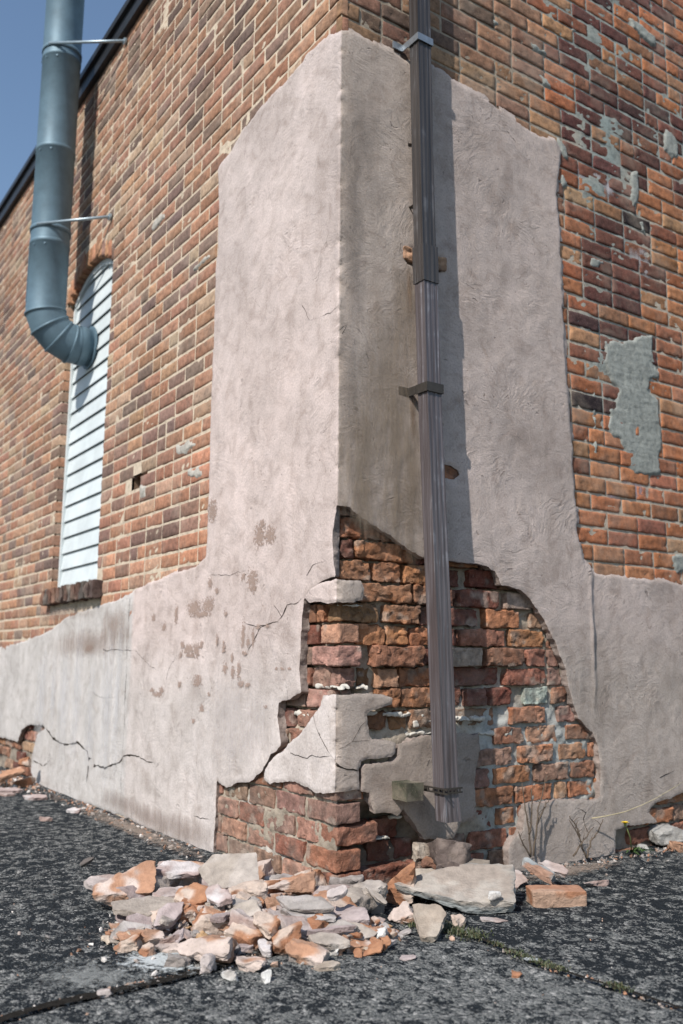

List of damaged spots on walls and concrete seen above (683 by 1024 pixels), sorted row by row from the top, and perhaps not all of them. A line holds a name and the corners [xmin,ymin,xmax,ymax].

crack [248,562,320,650]
spalling [0,725,45,787]
crack [34,717,151,781]
crack [291,716,369,771]
spalling [92,506,597,975]